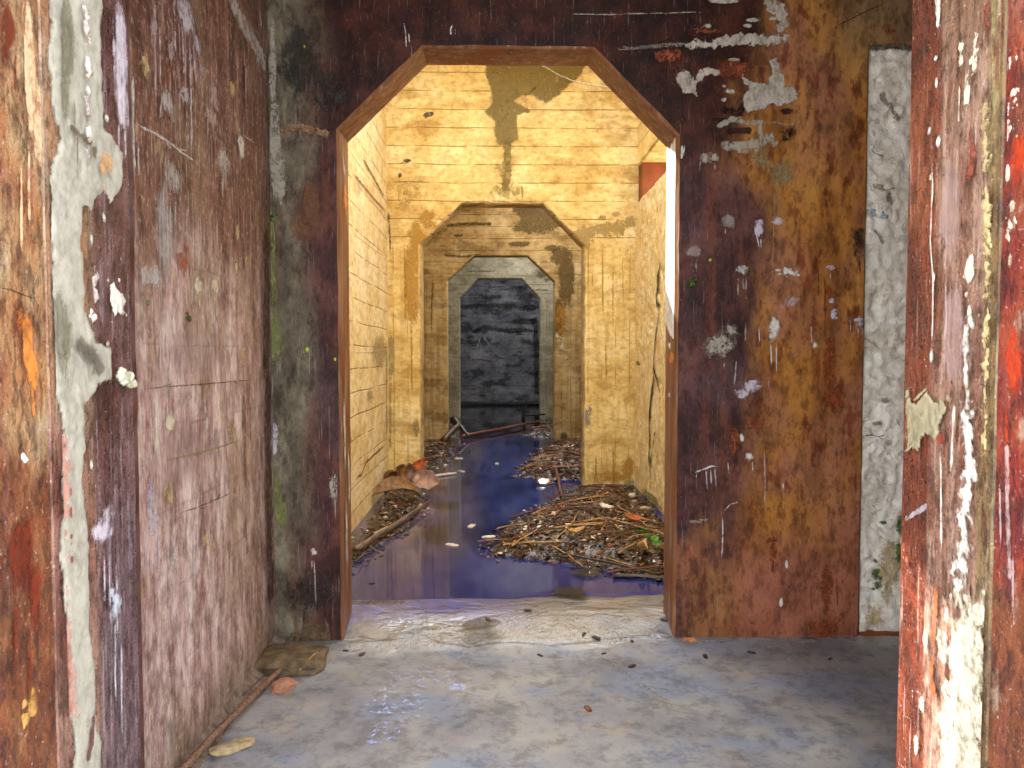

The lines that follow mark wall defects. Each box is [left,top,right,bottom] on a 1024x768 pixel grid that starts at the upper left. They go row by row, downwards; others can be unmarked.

water stain [485,65,584,247]
corrosion [656,49,681,76]
corrosion [713,104,752,134]
peeling [676,0,798,113]
corrosion [780,108,796,141]
peeling [48,0,123,768]
peeling [108,278,128,316]
water stain [404,211,491,385]
water stain [460,245,575,394]
crack [648,266,660,472]
peeling [898,388,950,452]
corrosion [1006,331,1021,389]